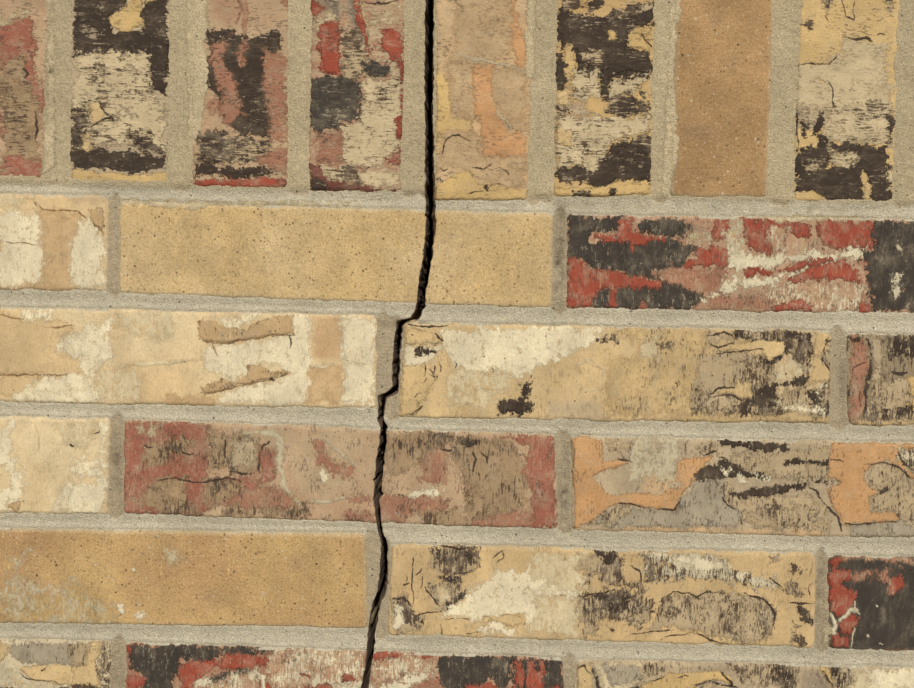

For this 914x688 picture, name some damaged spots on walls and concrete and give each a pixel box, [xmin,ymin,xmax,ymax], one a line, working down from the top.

crack [361,0,436,688]